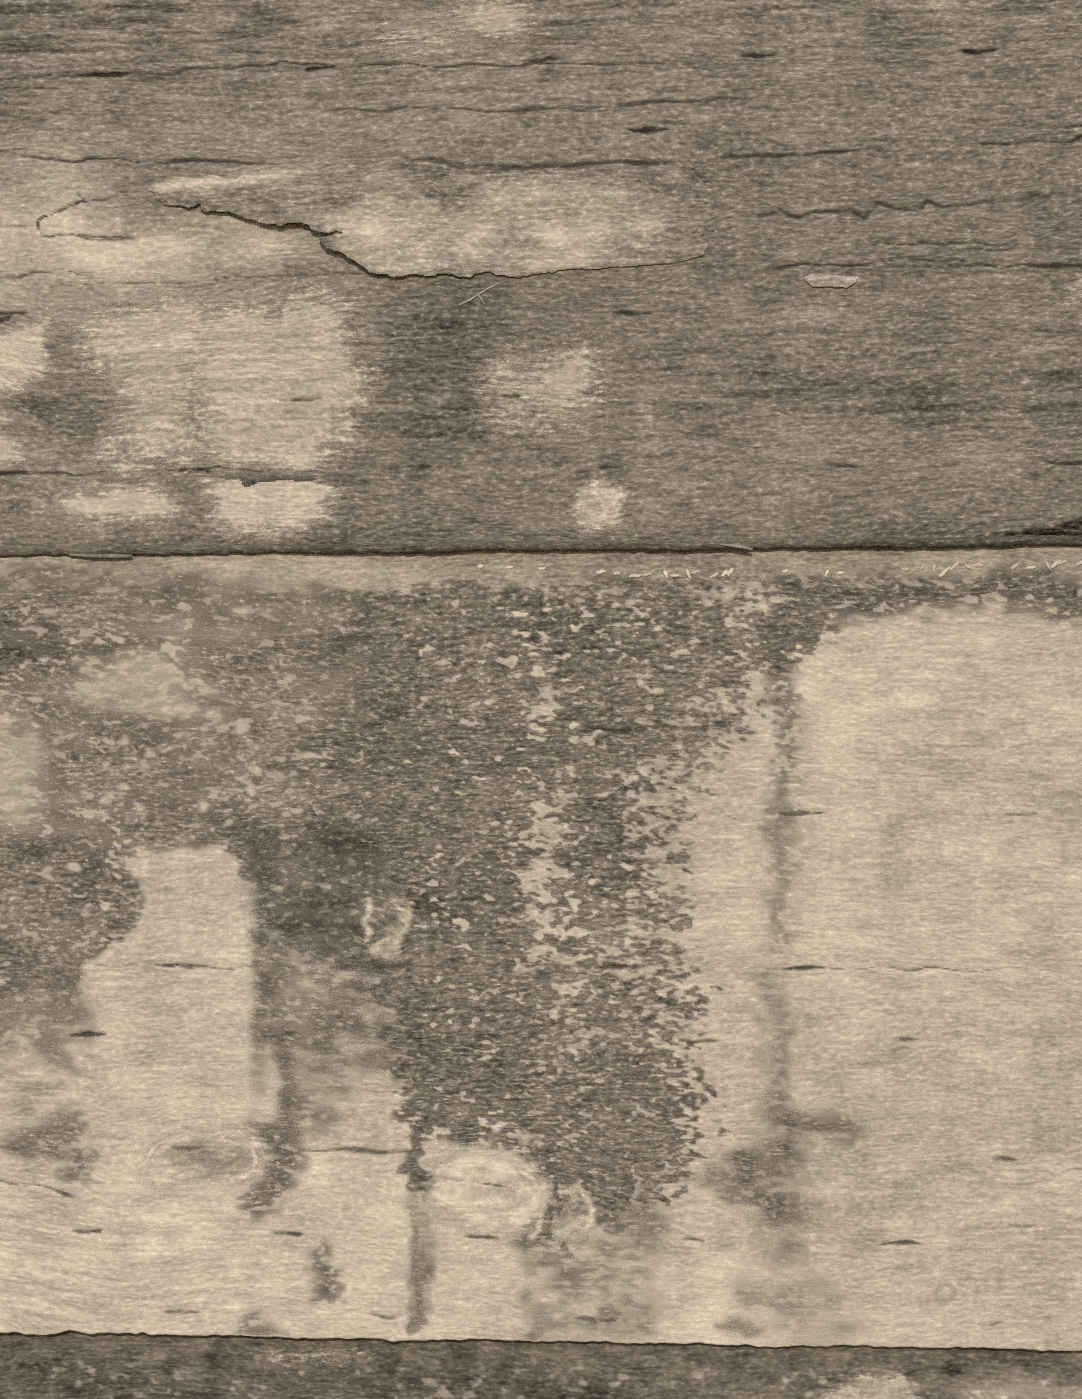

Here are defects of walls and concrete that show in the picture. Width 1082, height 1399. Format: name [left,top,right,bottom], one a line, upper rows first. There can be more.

peeling [147,155,718,278]
peeling [804,273,859,288]
crack [757,200,1082,268]
water stain [0,564,1082,1340]